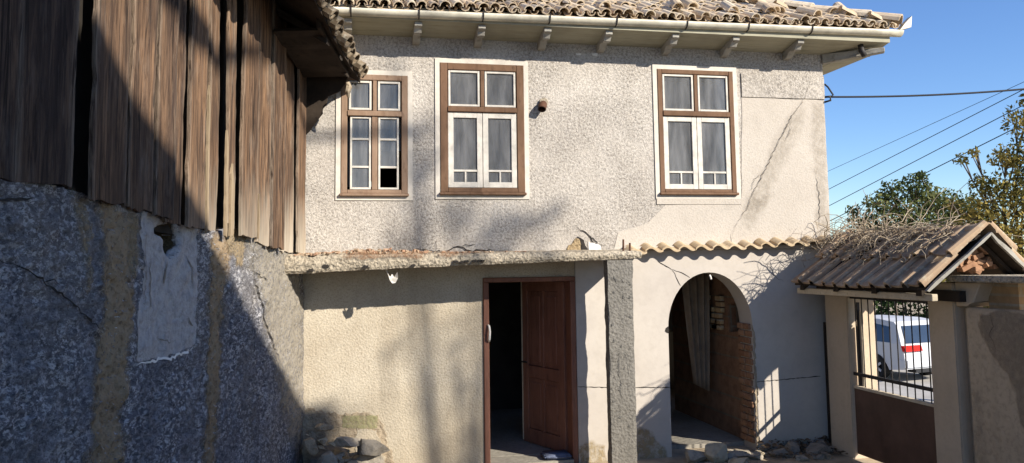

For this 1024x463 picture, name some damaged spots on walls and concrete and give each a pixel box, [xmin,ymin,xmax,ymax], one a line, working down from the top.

crack [730,81,810,241]
crack [0,260,104,353]
peeling [136,210,198,366]